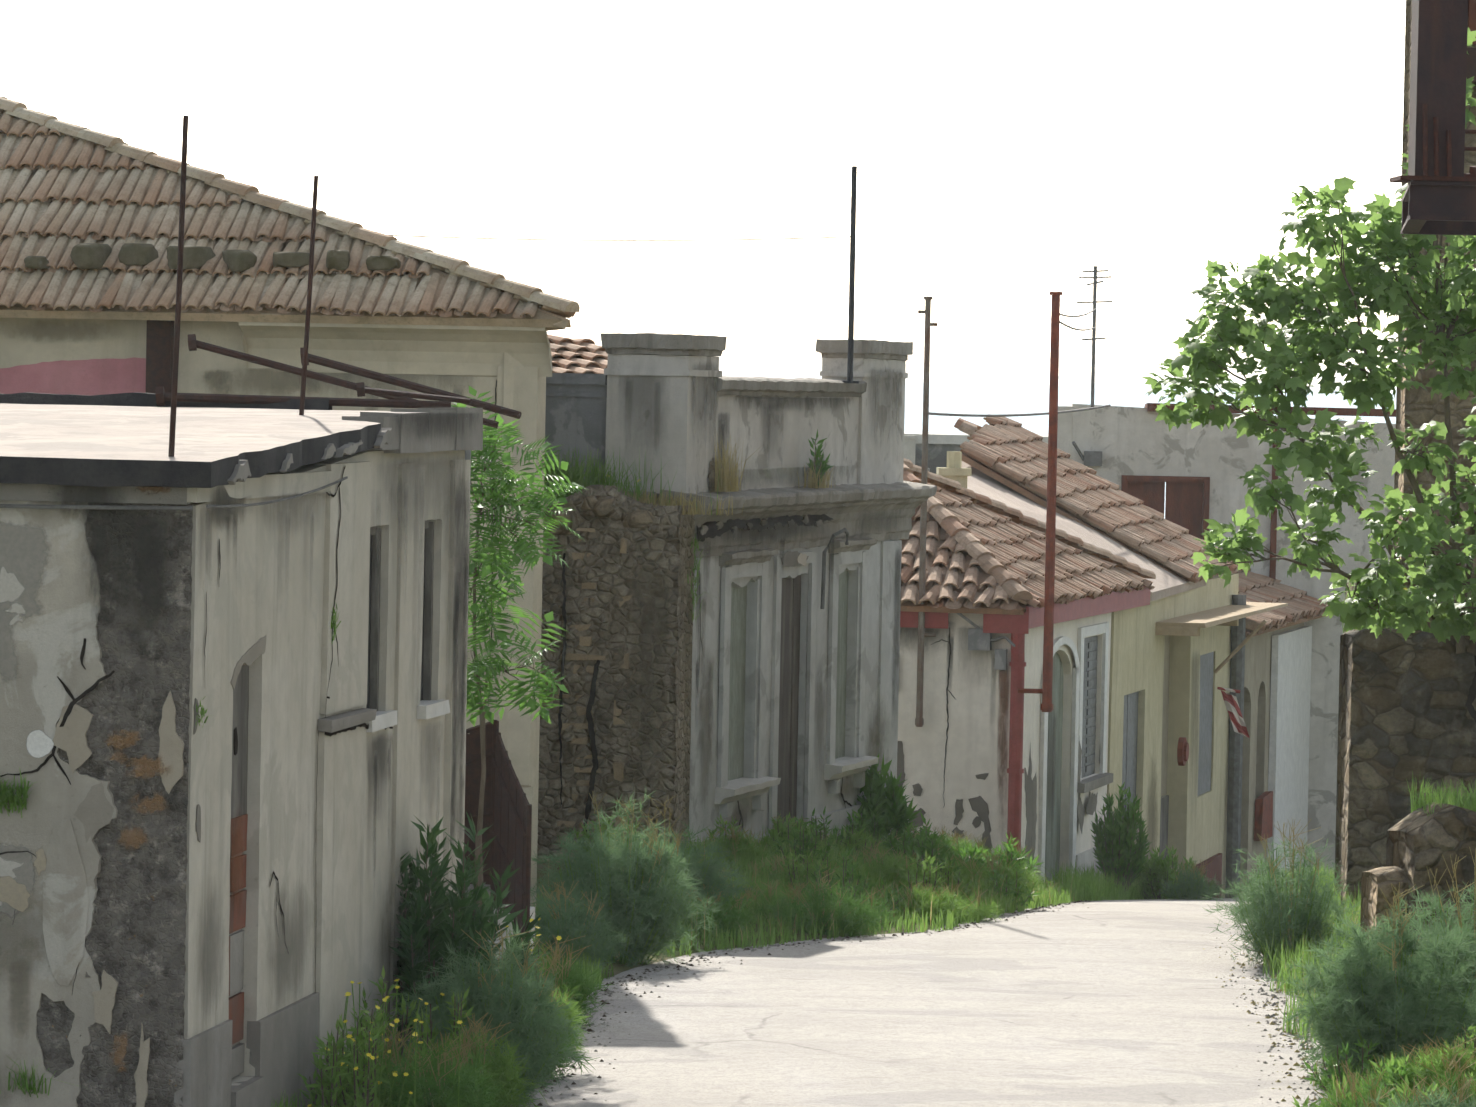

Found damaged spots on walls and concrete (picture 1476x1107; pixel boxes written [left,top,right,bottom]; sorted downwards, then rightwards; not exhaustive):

spalling [227,460,251,485]
spalling [279,453,293,473]
spalling [321,428,394,459]
peeling [0,522,48,681]
crack [316,467,393,809]
crack [0,638,115,785]
spalling [26,503,201,1107]
peeling [897,741,926,835]
peeling [940,773,992,851]
peeling [1021,743,1037,863]
flaking render [0,844,46,918]
crack [270,870,316,993]